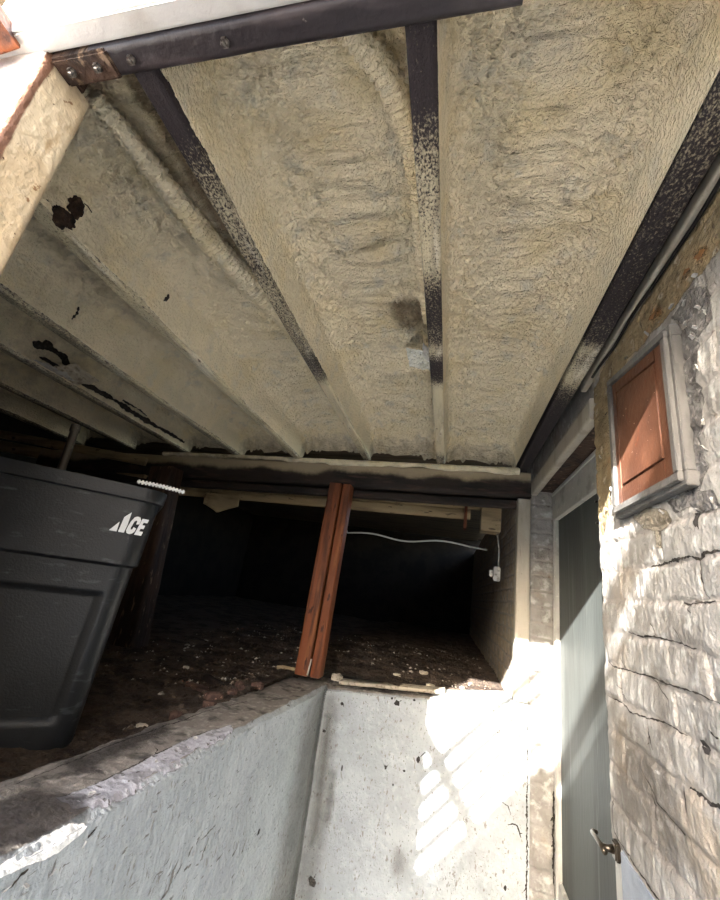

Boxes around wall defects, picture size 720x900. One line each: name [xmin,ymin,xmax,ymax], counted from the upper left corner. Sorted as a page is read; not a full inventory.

crack [651,549,720,613]
peeling [94,623,302,713]
peeling [330,635,494,690]
crack [628,624,697,649]
peeling [122,713,164,731]
crack [608,660,720,750]
peeling [69,725,234,809]
crack [642,771,720,836]
peeling [0,823,96,894]
peeling [152,826,215,900]